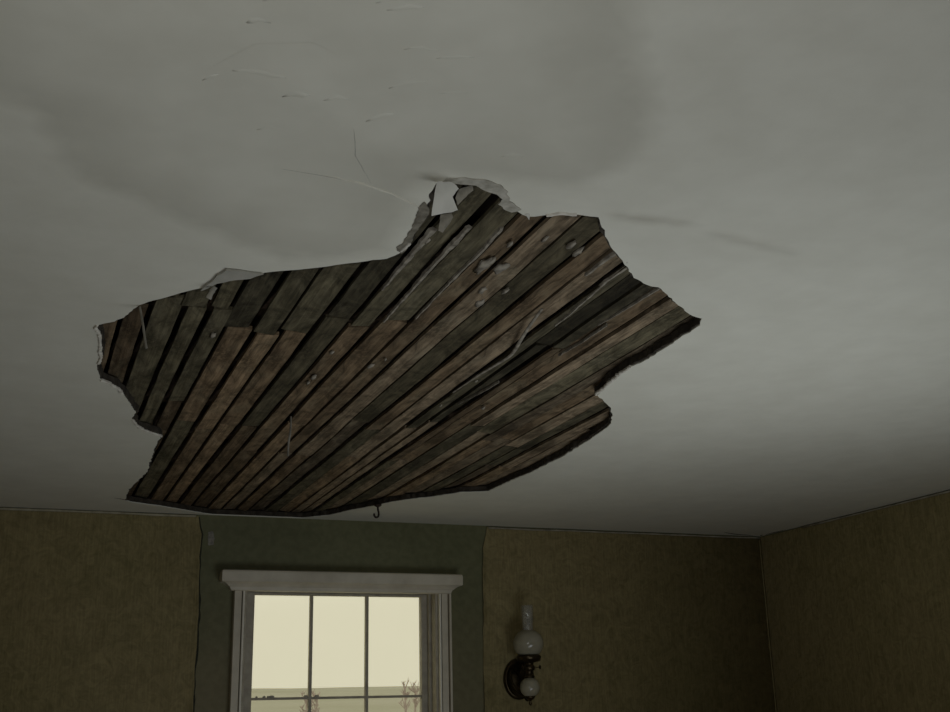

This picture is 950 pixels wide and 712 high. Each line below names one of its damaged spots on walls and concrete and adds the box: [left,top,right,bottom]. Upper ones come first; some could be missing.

flaking render [201,269,264,300]
flaking render [381,177,530,323]
flaking render [554,217,633,326]
flaking render [93,308,701,517]